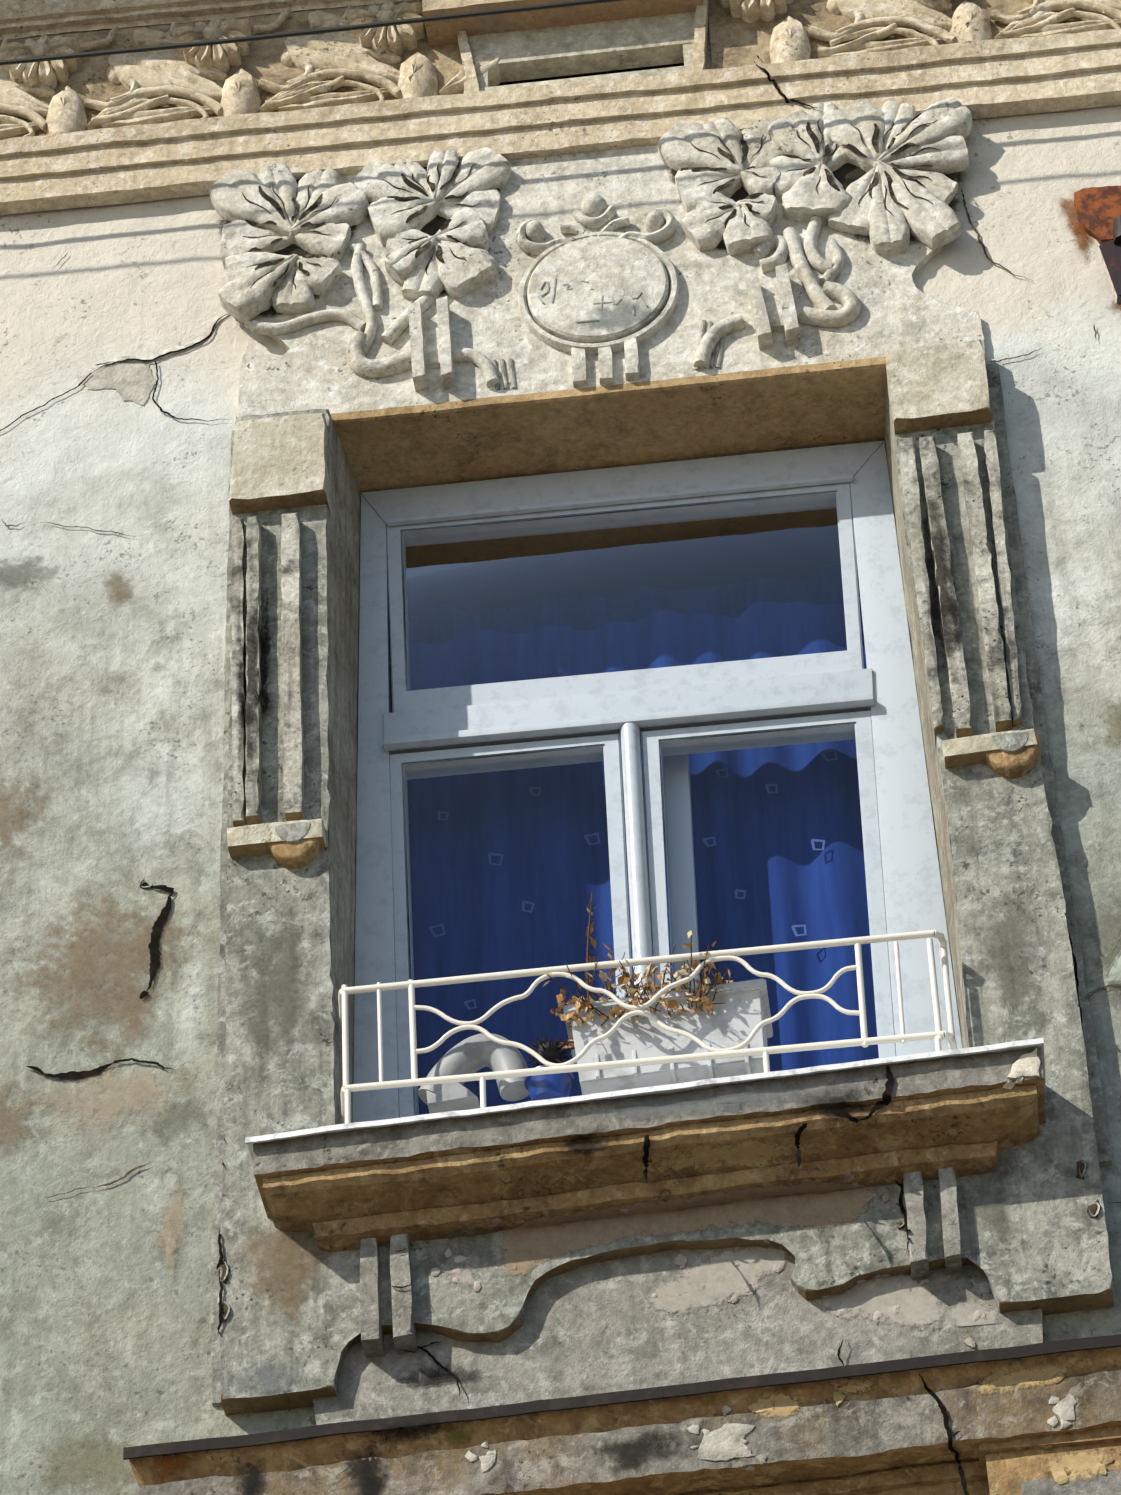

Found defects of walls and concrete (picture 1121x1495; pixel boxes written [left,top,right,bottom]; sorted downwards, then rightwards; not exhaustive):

corrosion [1060,199,1091,251]
crack [0,313,230,431]
damp [237,598,270,759]
crack [139,885,174,999]
crack [26,1058,174,1080]
crack [795,1065,894,1167]
peeling [492,1171,890,1313]
peeling [815,1273,1001,1349]
peeling [465,1440,497,1472]
peeling [687,1390,799,1492]
crack [919,1374,969,1495]
peeling [979,1353,1114,1485]